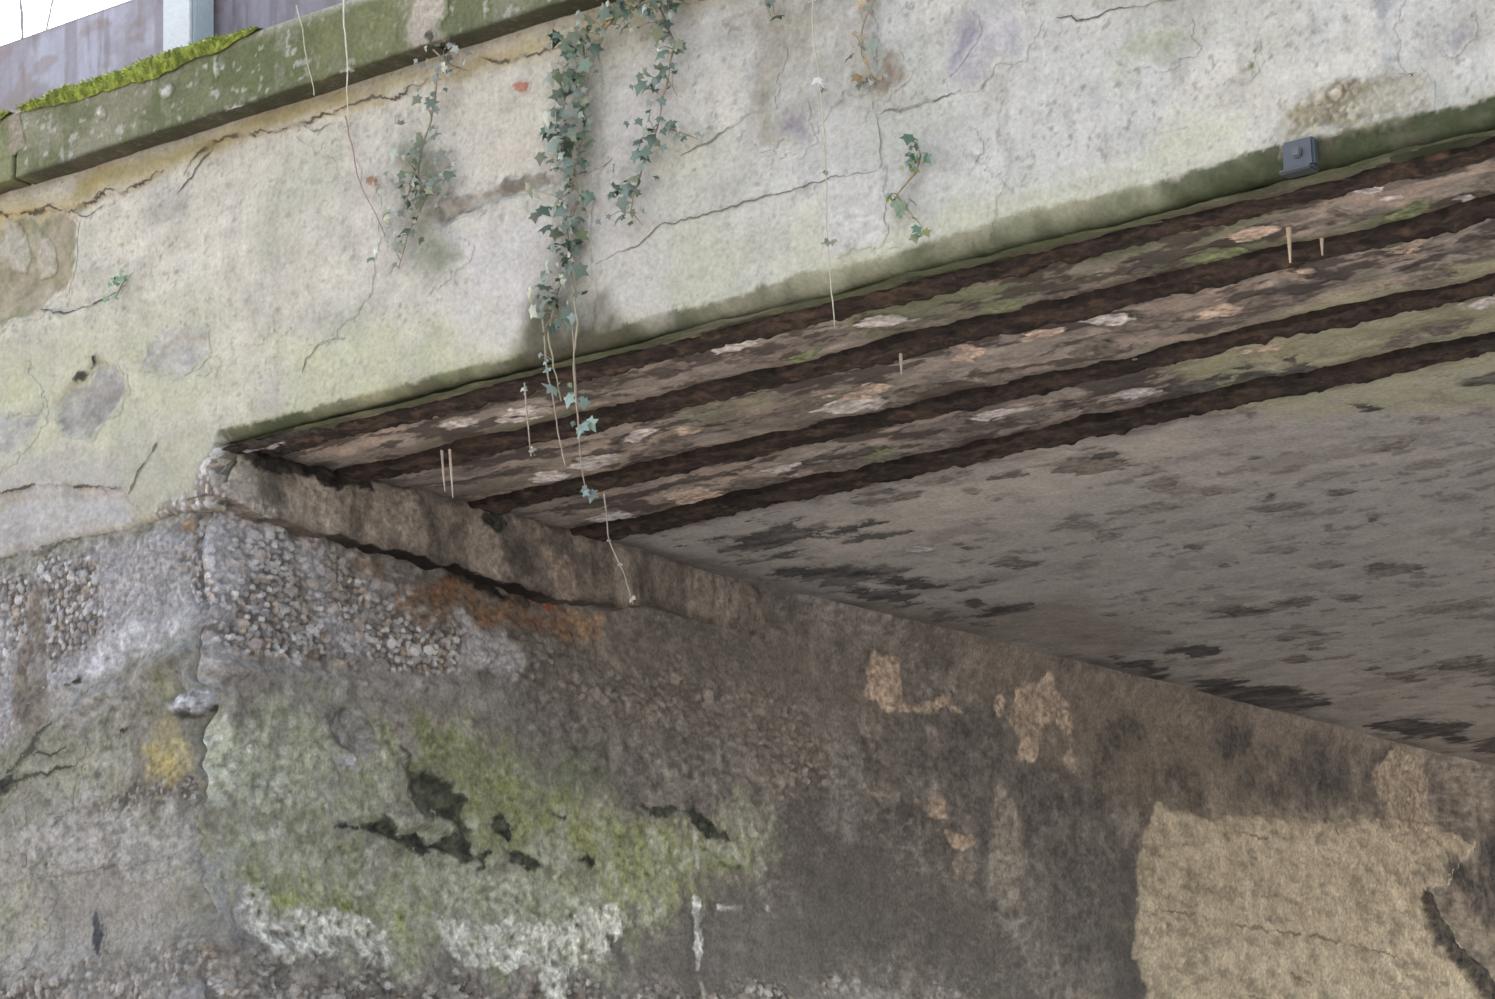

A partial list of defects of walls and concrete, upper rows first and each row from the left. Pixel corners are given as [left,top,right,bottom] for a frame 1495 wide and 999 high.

crack [1056,0,1172,22]
crack [0,78,428,225]
crack [596,93,955,264]
peeling [851,225,1284,331]
peeling [1017,266,1347,361]
peeling [526,343,1027,484]
peeling [652,343,1323,505]
rust [338,544,607,654]
peeling [664,446,1368,628]
crack [0,722,77,801]
water stain [817,654,1495,999]
peeling [1421,885,1495,999]